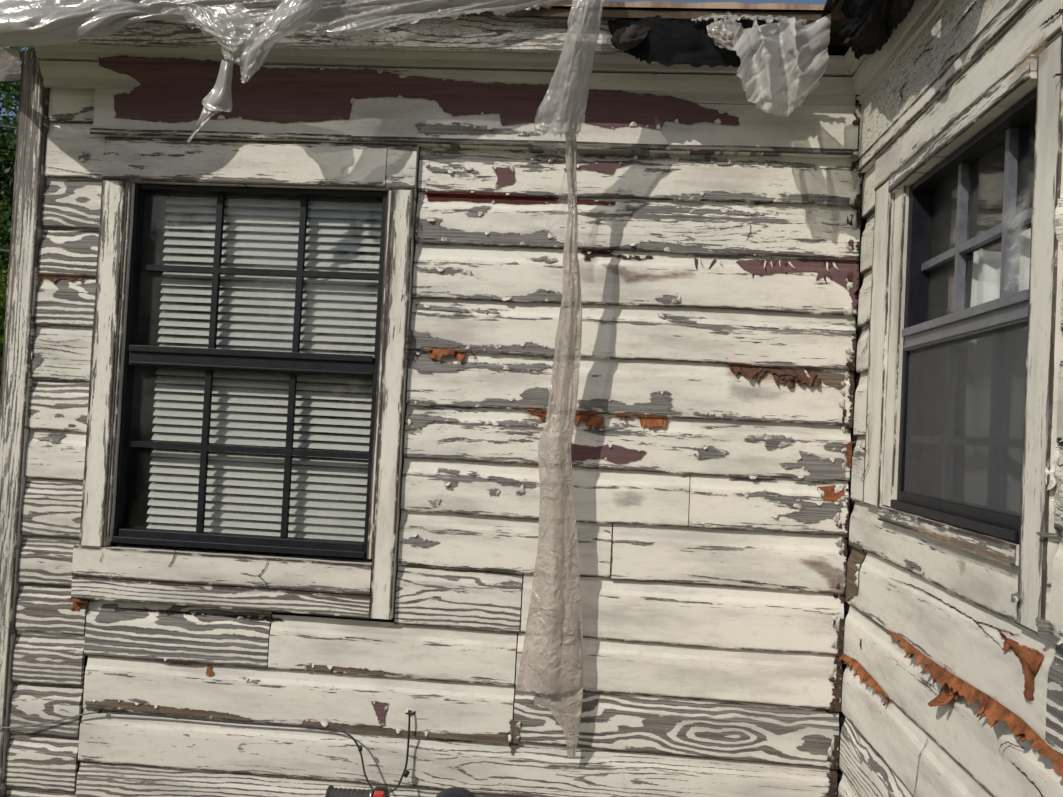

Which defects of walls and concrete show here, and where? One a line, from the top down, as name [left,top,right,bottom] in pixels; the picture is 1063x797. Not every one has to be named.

crack [1039,9,1063,28]
crack [899,1,976,106]
peeling [98,55,818,174]
crack [852,95,862,125]
peeling [426,165,850,217]
peeling [414,215,564,263]
peeling [581,240,860,309]
peeling [405,329,555,374]
peeling [571,390,765,464]
crack [694,151,870,797]
peeling [744,434,847,486]
peeling [301,701,522,754]